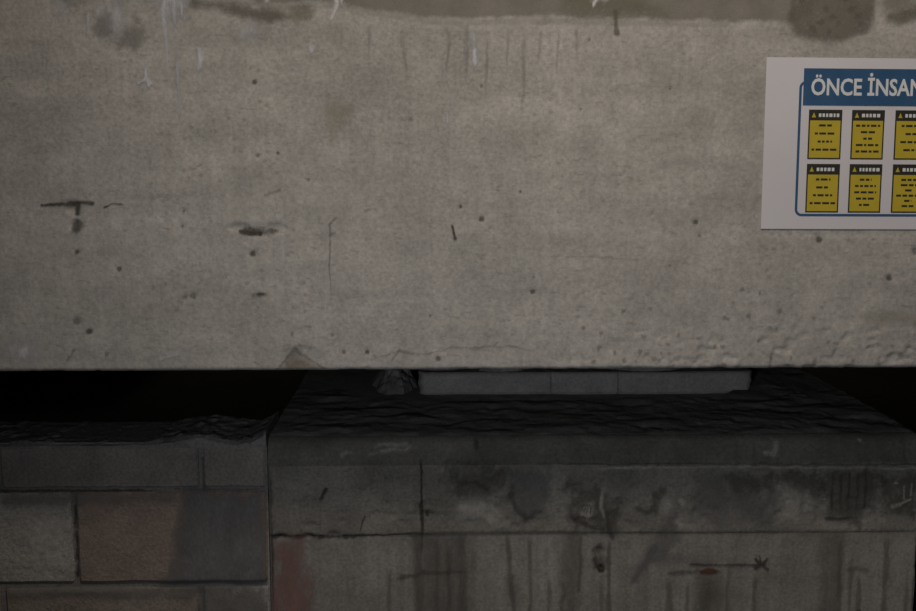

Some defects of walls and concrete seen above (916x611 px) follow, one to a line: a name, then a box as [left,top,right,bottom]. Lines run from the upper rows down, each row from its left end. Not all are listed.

leakage [161,0,300,113]
leakage [323,0,873,39]